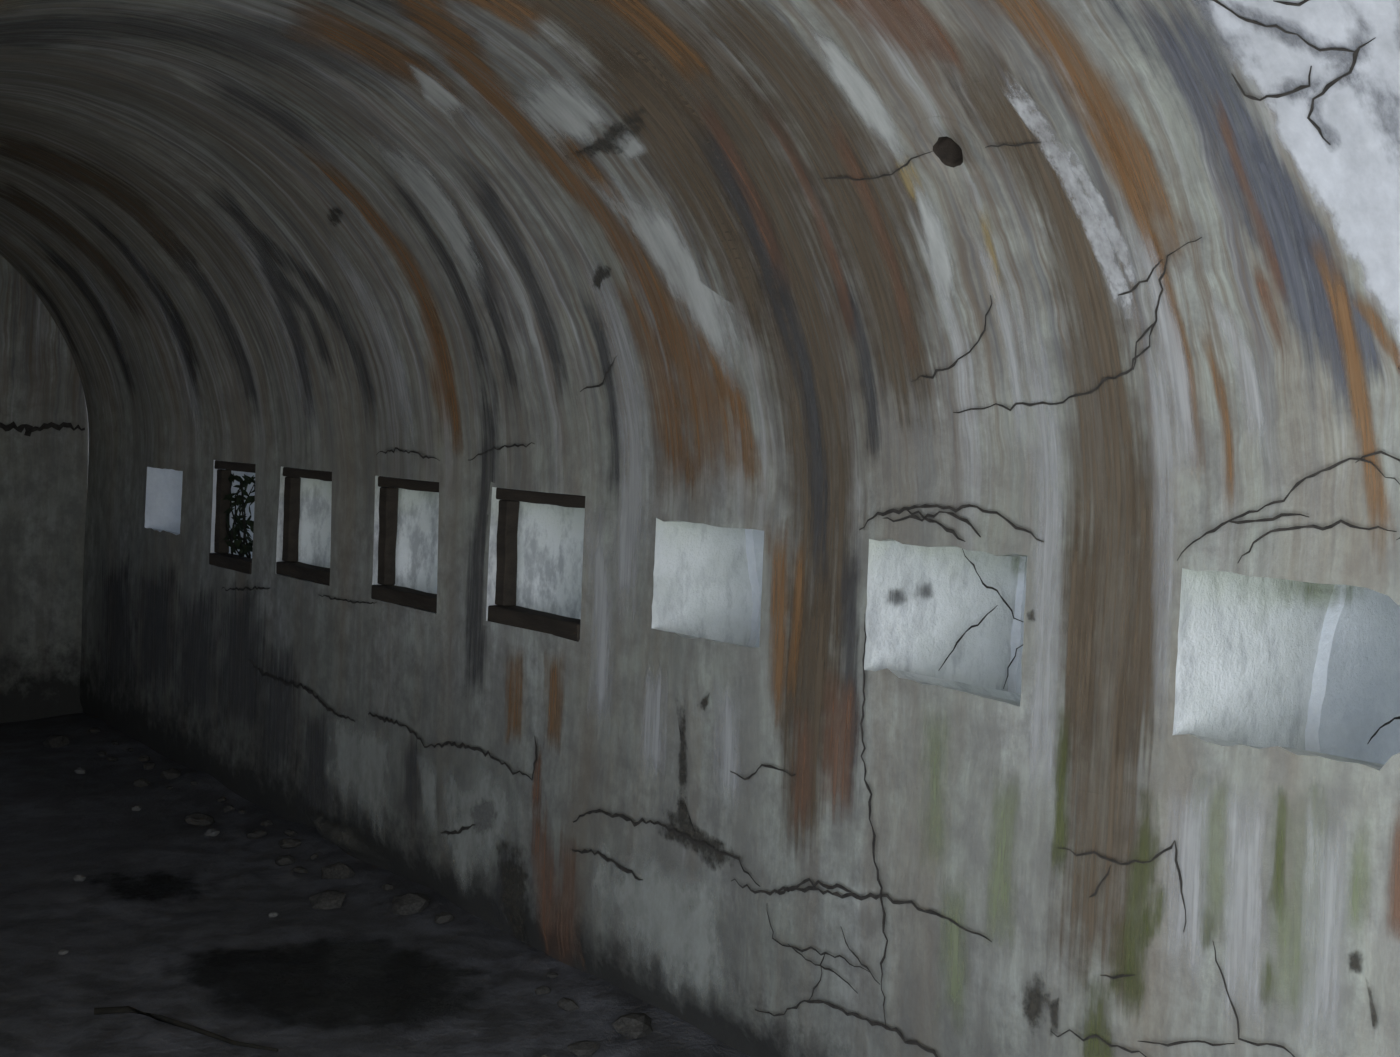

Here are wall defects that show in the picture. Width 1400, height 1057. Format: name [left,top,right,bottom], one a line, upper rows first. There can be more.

rust [398,0,753,476]
rust [998,0,1196,429]
crack [1212,0,1376,145]
peeling [1201,0,1400,341]
rust [771,545,803,717]
leakage [962,60,1210,1003]
rust [1210,351,1233,493]
crack [1177,451,1400,563]
crack [572,613,992,1057]
leakage [1084,1001,1111,1057]
crack [1051,840,1295,1057]
leakage [1227,801,1303,1002]